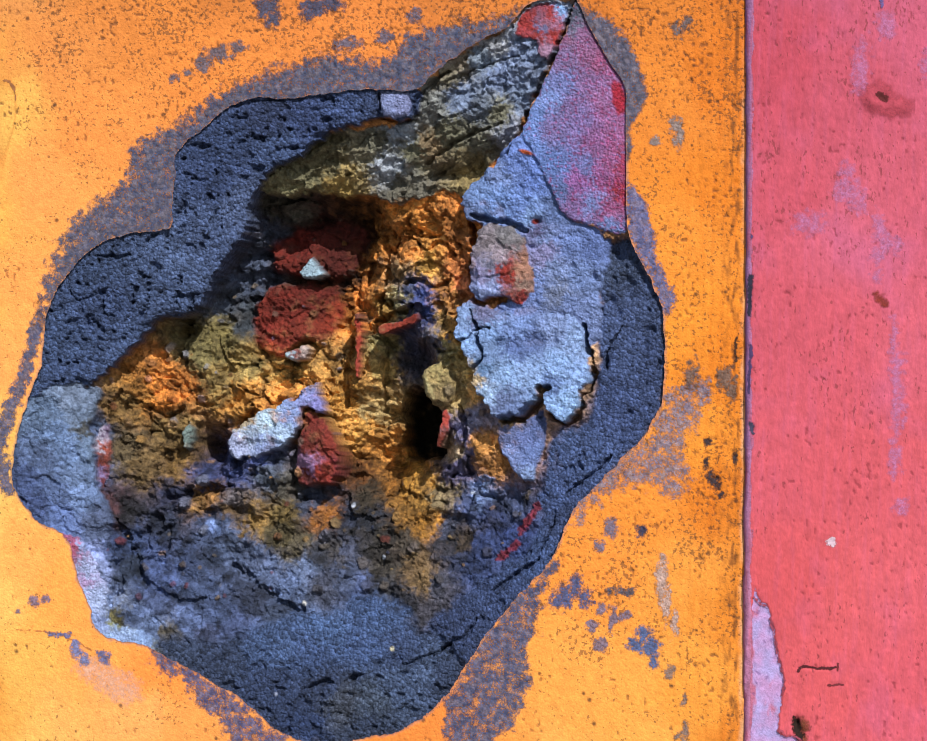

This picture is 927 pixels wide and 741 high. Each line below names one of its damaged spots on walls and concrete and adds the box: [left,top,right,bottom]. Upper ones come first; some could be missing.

peeling [669,15,693,39]
peeling [649,116,685,150]
spalling [12,0,665,741]
peeling [684,354,701,389]
peeling [715,0,802,741]
peeling [625,626,676,679]
peeling [674,721,689,741]